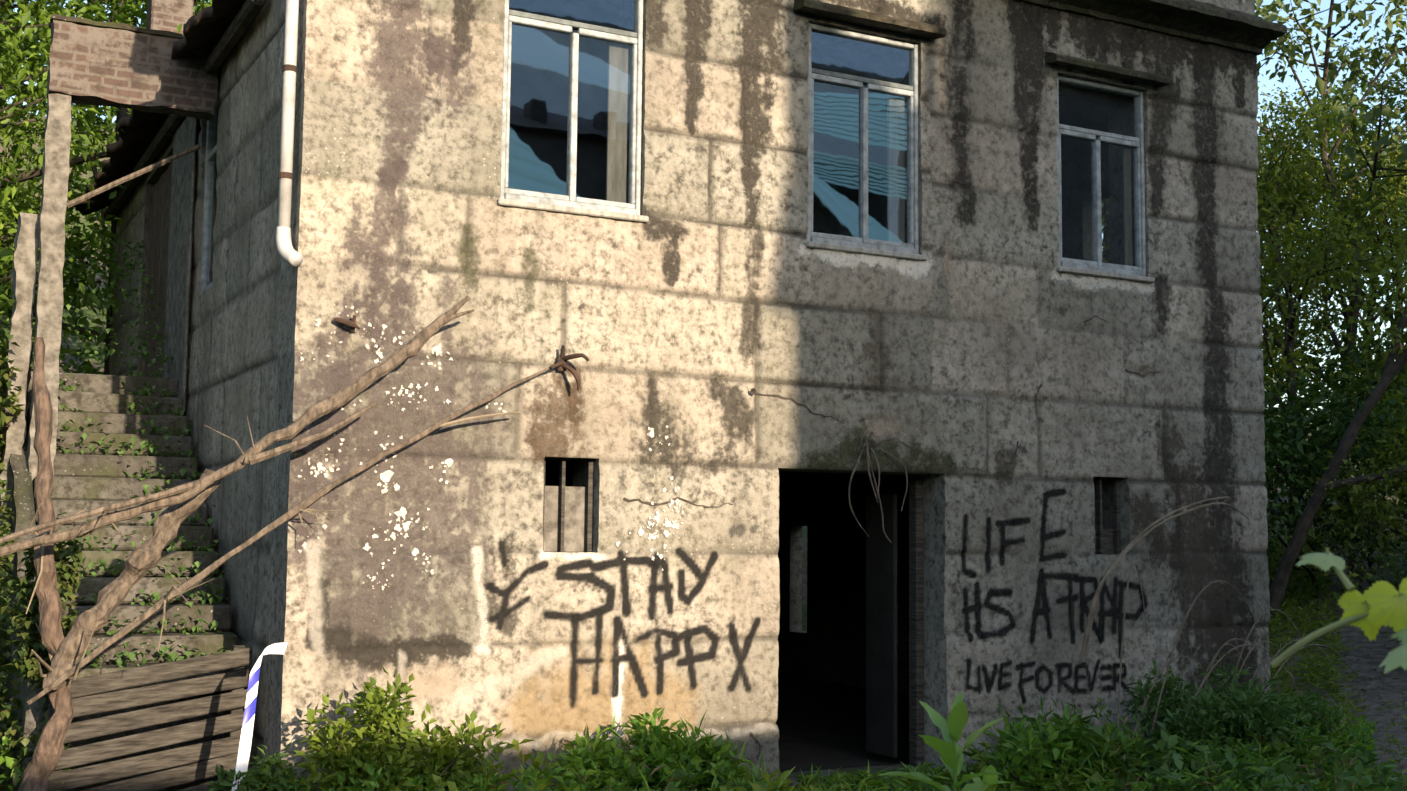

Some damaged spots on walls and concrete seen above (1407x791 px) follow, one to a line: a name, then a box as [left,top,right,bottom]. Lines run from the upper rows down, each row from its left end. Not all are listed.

water stain [730,0,782,354]
water stain [830,0,977,228]
water stain [288,0,517,739]
water stain [639,378,754,486]
water stain [996,449,1018,486]
water stain [1007,0,1268,709]